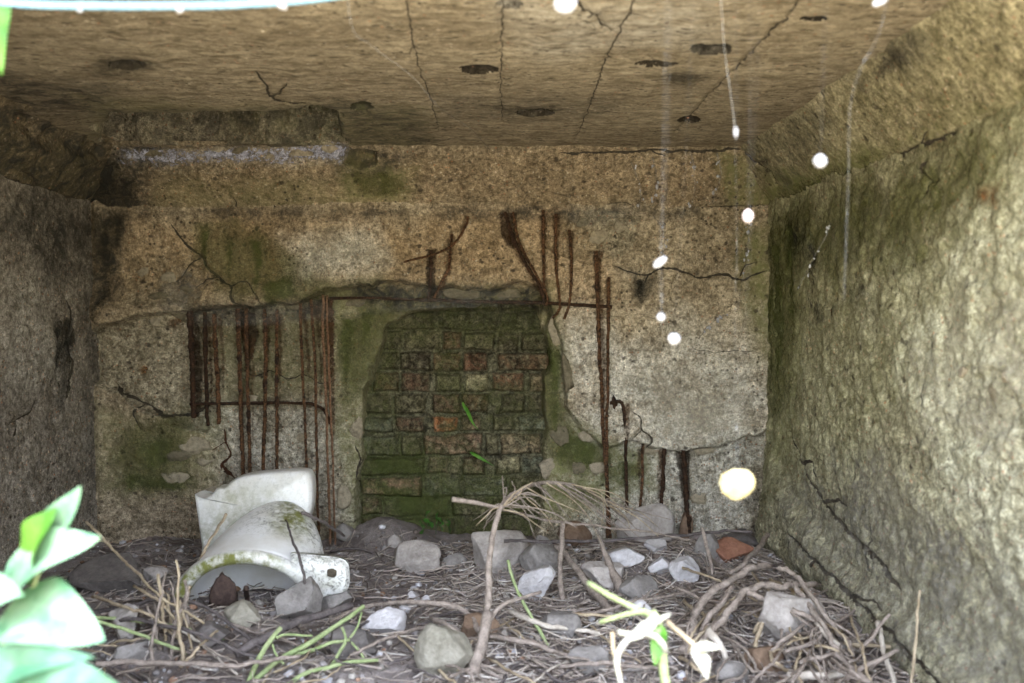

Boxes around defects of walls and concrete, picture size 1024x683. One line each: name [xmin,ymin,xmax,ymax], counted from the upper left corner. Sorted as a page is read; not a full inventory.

water stain [91,142,346,311]
corrosion [500,212,573,296]
crack [560,0,798,195]
crack [613,262,765,297]
crack [900,123,971,195]
crack [117,383,211,429]
corrosion [171,311,282,446]
spalling [92,251,767,541]
corrosion [594,251,630,444]
corrosion [657,449,666,498]
corrosion [676,451,690,500]
crack [788,431,940,683]